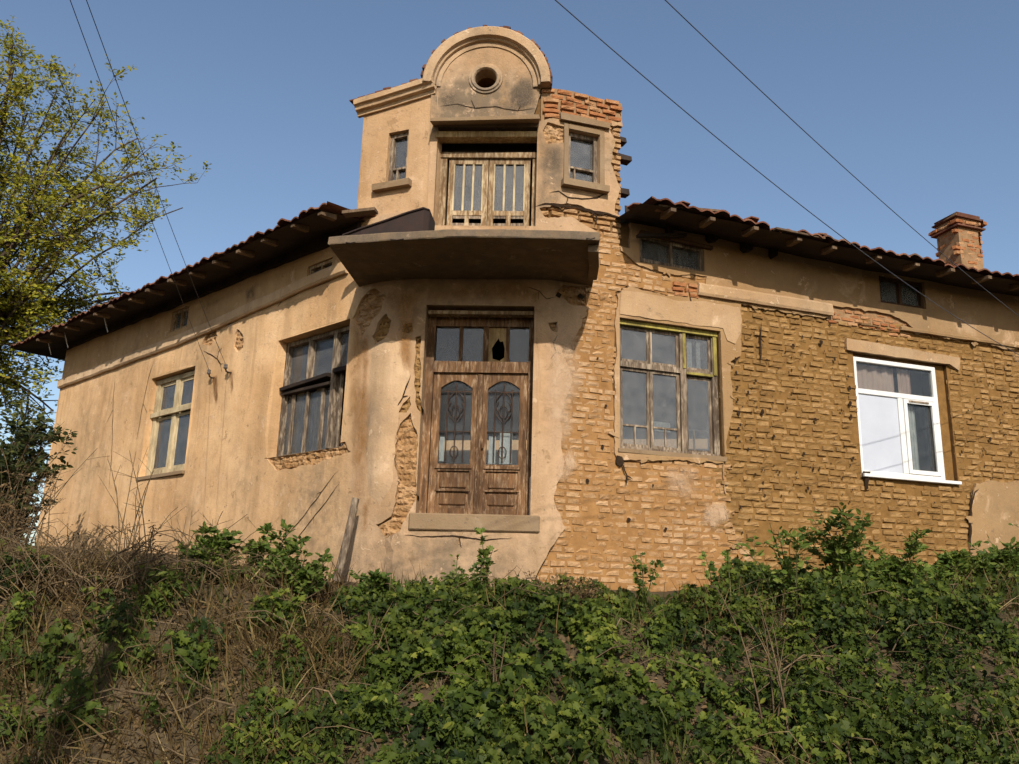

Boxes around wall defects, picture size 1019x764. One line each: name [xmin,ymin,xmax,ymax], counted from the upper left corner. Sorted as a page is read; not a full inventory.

flaking render [266,442,351,471]
flaking render [351,289,391,343]
flaking render [379,324,421,538]
flaking render [536,88,1019,592]